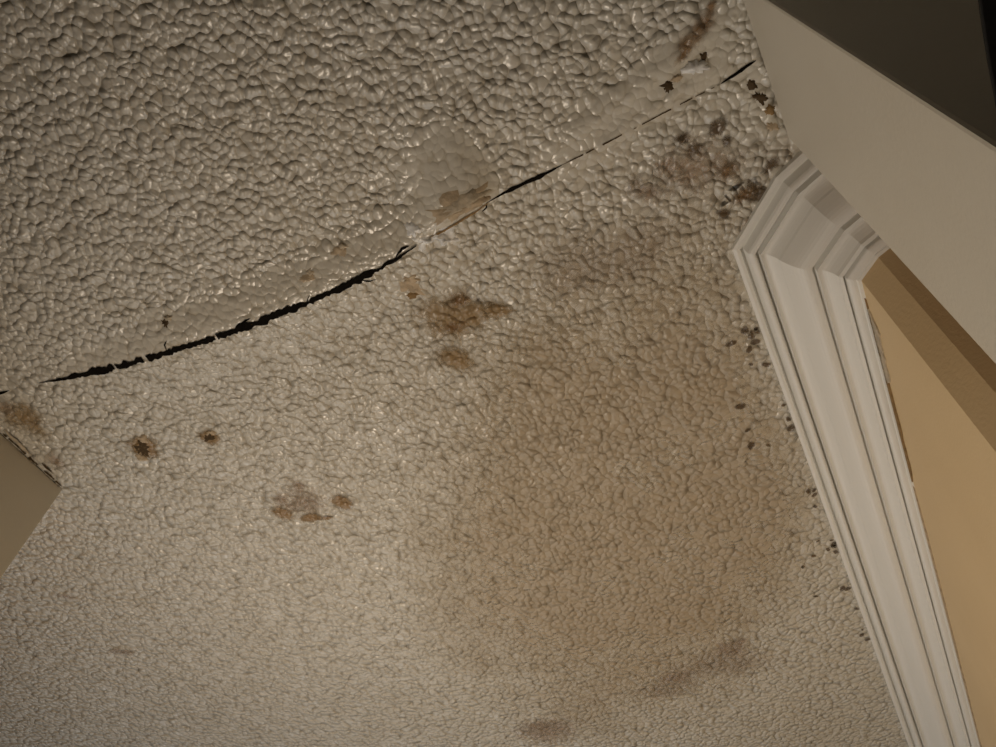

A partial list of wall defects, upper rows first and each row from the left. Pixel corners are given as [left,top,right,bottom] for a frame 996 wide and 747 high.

crack [482,60,756,212]
leakage [710,121,731,146]
leakage [662,134,734,184]
leakage [765,159,778,174]
leakage [734,181,766,202]
crack [40,246,416,383]
leakage [425,296,513,338]
leakage [439,349,470,370]
leakage [726,327,770,367]
leakage [271,483,332,522]
leakage [331,496,353,510]
leakage [469,342,775,648]